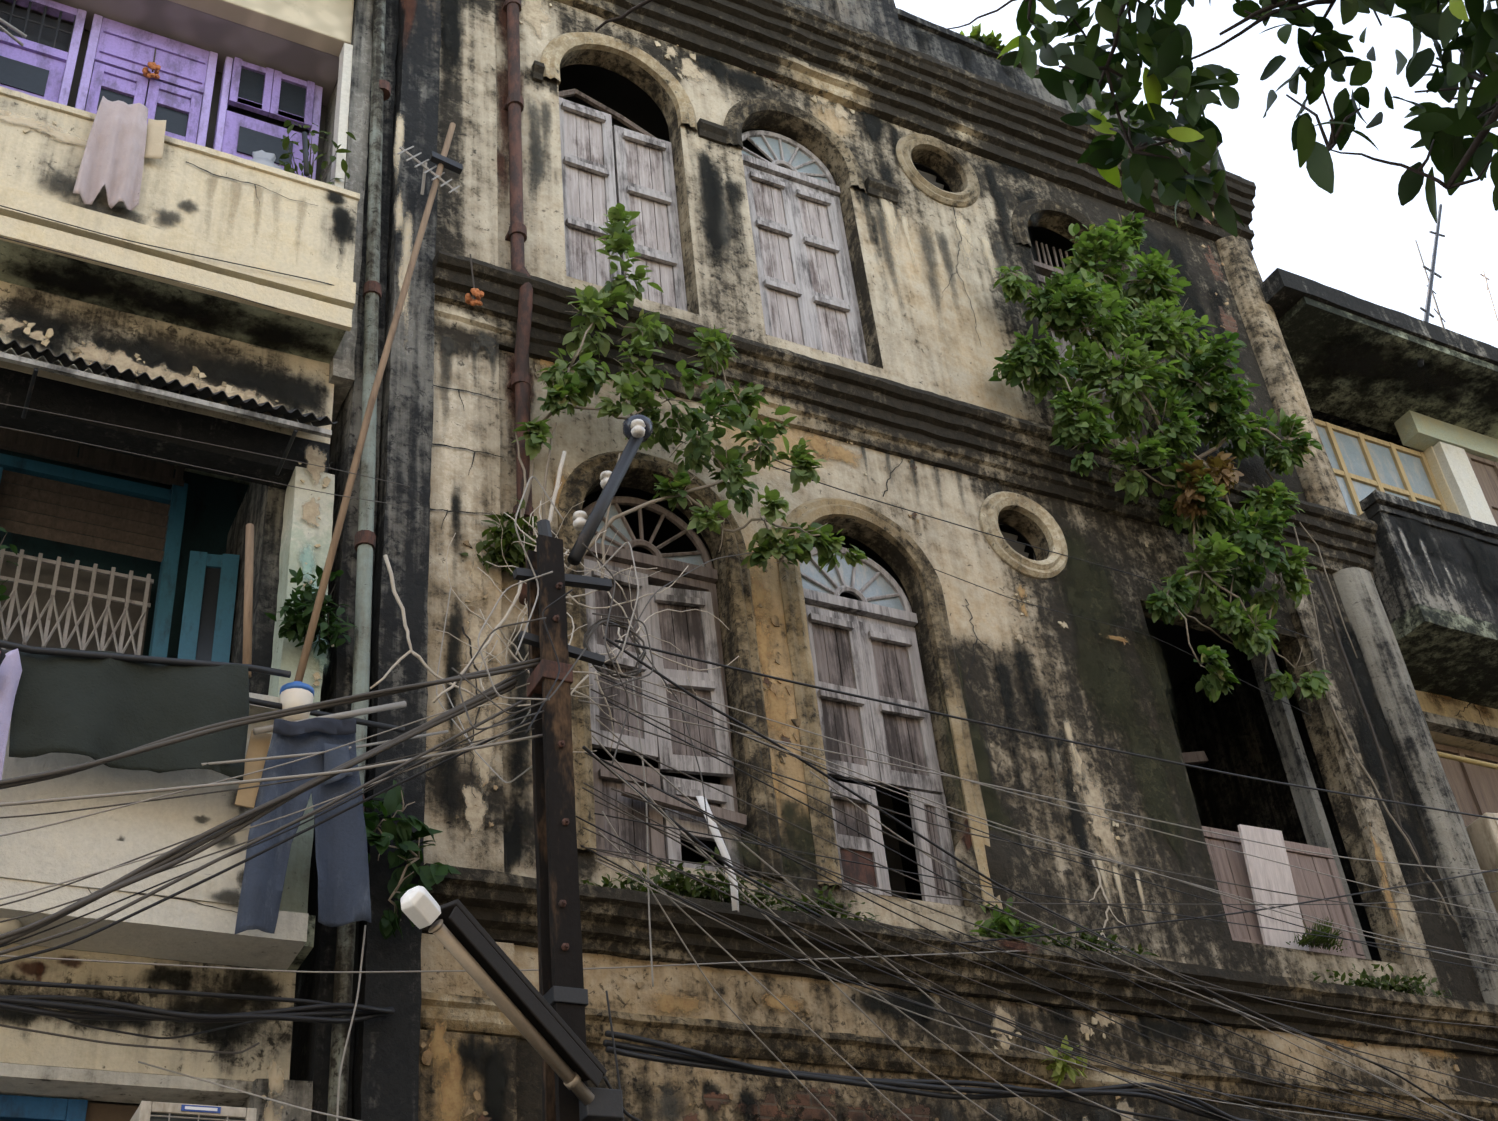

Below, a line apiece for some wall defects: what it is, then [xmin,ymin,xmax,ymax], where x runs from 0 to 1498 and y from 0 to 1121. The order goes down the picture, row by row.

leakage [395,118,404,164]
corrosion [497,0,523,193]
leakage [396,196,412,310]
leakage [698,152,742,261]
peeling [0,318,54,347]
leakage [3,264,336,358]
peeling [71,341,283,417]
leakage [94,337,323,411]
corrosion [507,356,535,436]
leakage [939,659,1015,838]
leakage [995,644,1144,907]
flaking render [682,1080,939,1121]